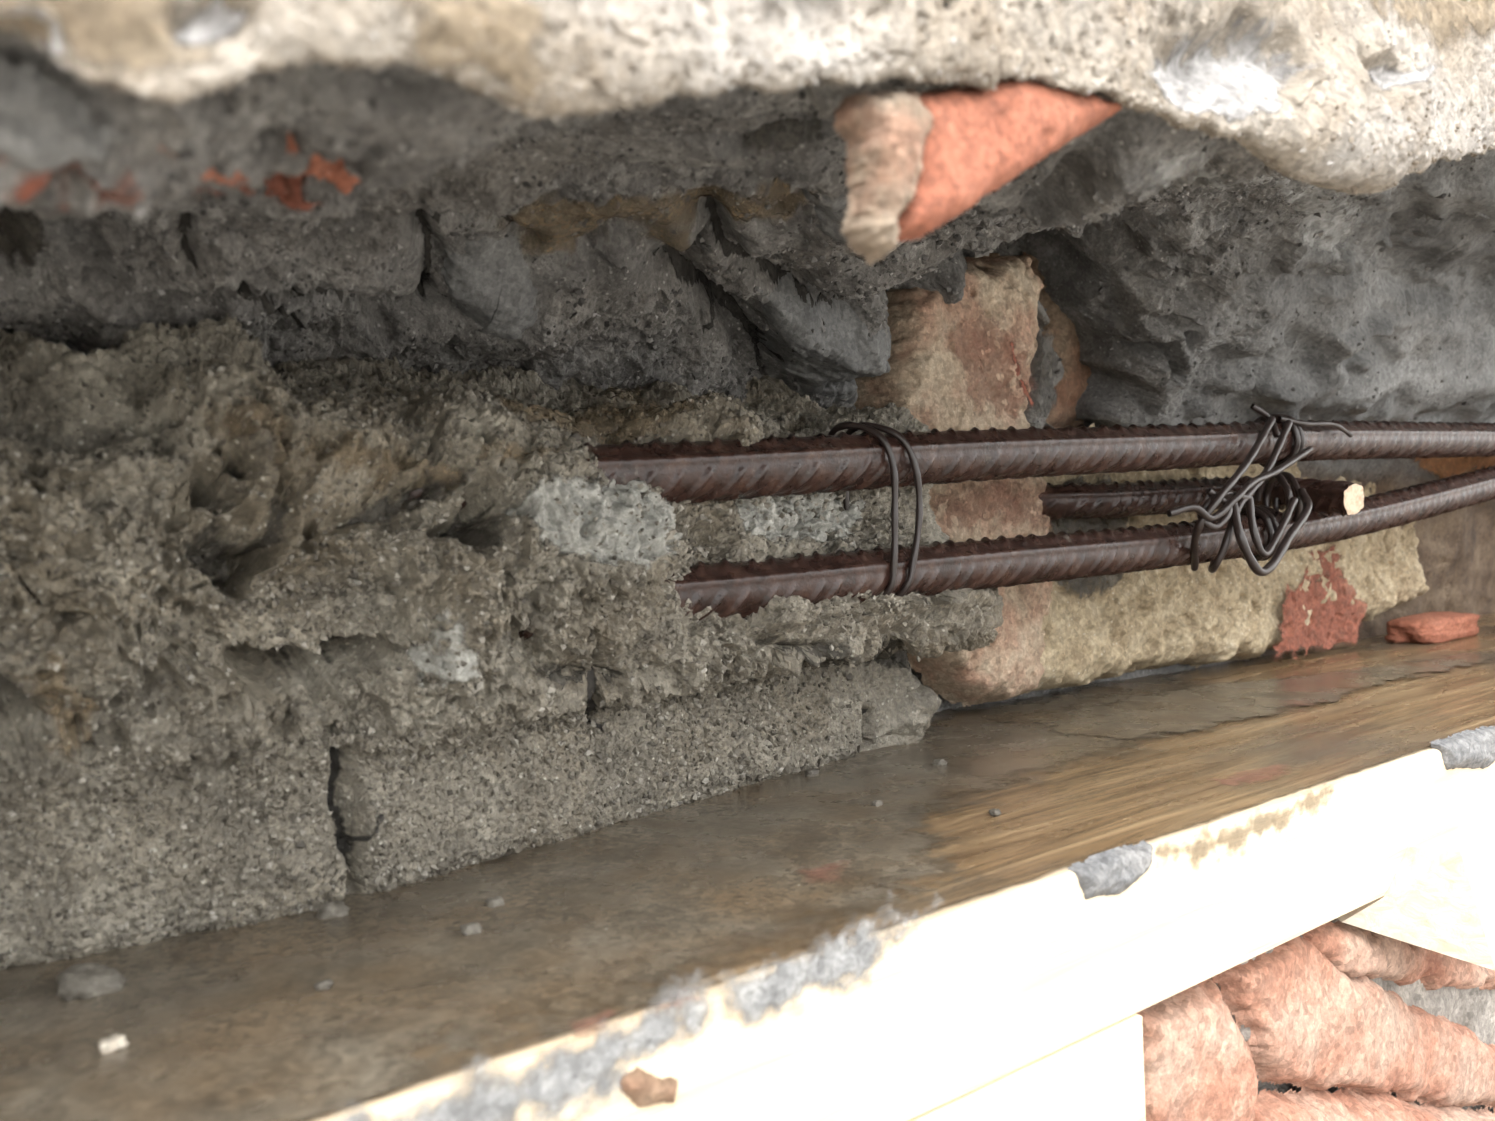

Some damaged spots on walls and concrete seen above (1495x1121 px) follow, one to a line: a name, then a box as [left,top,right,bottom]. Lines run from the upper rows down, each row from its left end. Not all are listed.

spalling [1150,19,1330,123]
spalling [1368,64,1436,90]
spalling [286,132,360,195]
spalling [0,204,48,269]
spalling [184,488,291,584]
spalling [347,469,465,525]
spalling [439,500,501,549]
spalling [583,420,1495,659]
rust [1414,456,1495,479]
spalling [532,664,623,690]
spalling [755,636,911,670]
crack [327,745,384,867]